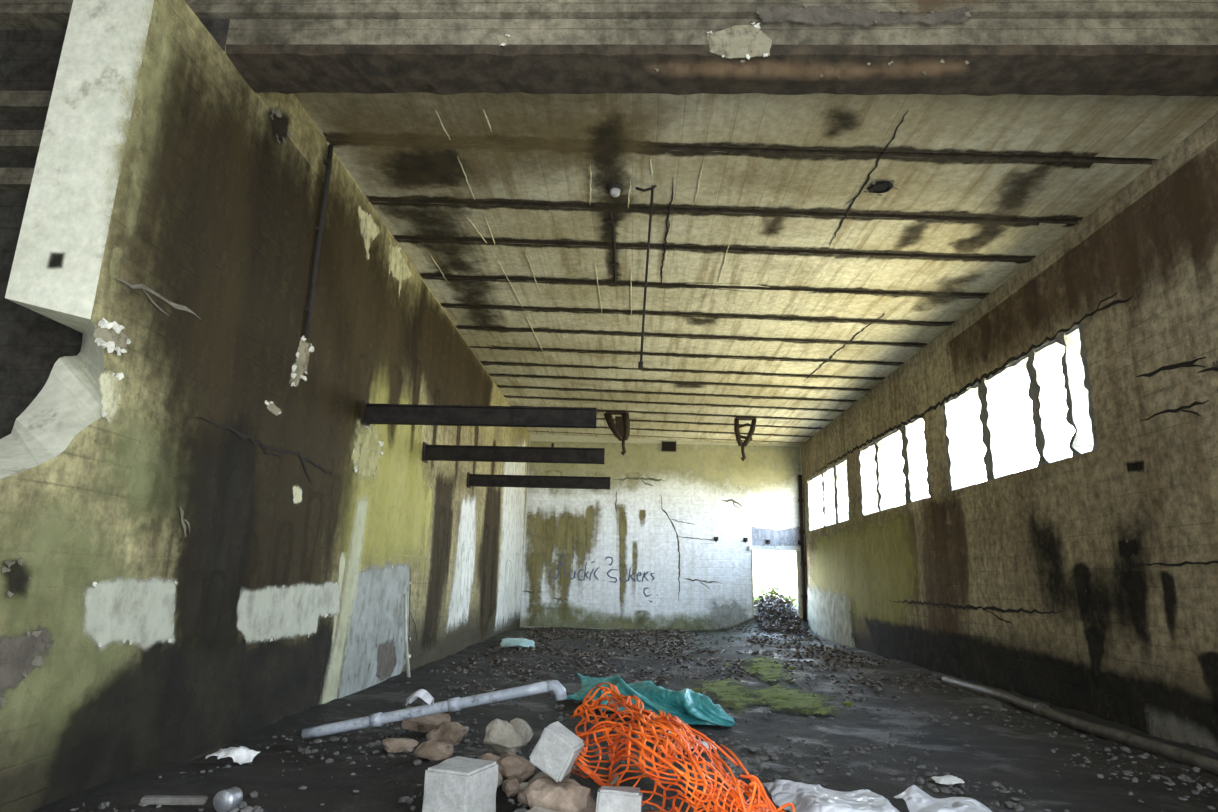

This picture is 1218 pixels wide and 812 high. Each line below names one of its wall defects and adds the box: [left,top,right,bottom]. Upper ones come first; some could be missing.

spalling [707,22,772,60]
crack [829,111,908,246]
damp [949,146,1218,371]
peeling [93,318,131,355]
peeling [289,335,314,387]
damp [42,53,1084,807]
crack [1136,357,1218,421]
spalling [2,559,32,598]
spalling [0,626,55,708]
crack [613,477,723,602]
crack [889,600,1063,625]
damp [865,520,1218,752]